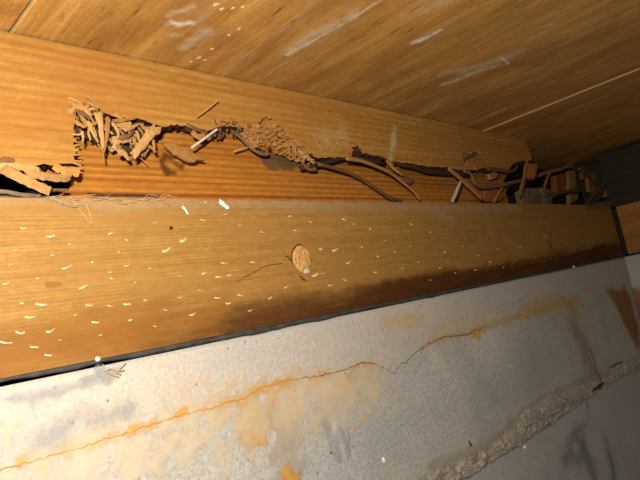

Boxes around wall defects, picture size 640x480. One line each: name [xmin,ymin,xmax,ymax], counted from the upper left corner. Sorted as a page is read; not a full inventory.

peeling [163,141,205,163]
leakage [0,244,622,375]
crack [1,326,486,470]
corrosion [121,362,378,480]
spalling [418,356,640,480]